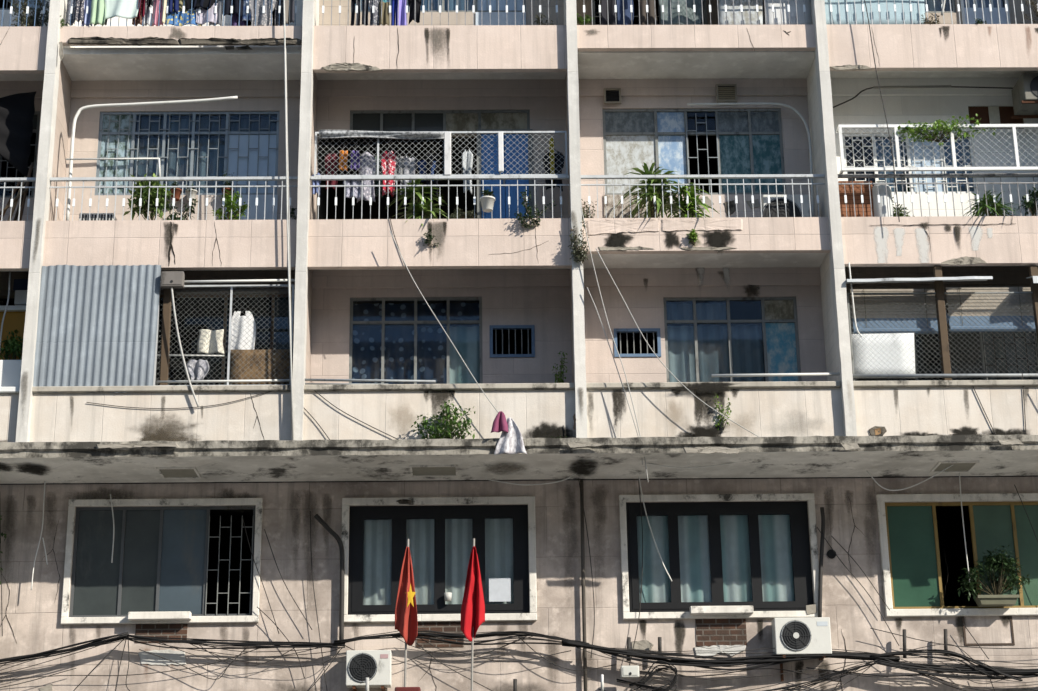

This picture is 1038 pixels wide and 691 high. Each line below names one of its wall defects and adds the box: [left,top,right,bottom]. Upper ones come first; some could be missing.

leakage [425,28,450,54]
leakage [165,223,178,249]
leakage [605,232,633,251]
leakage [665,231,679,248]
leakage [703,230,734,252]
peeling [874,226,993,265]
leakage [143,397,194,441]
leakage [526,423,573,438]
leakage [613,389,625,421]
leakage [672,382,739,437]
leakage [904,427,1028,436]
leakage [0,465,49,475]